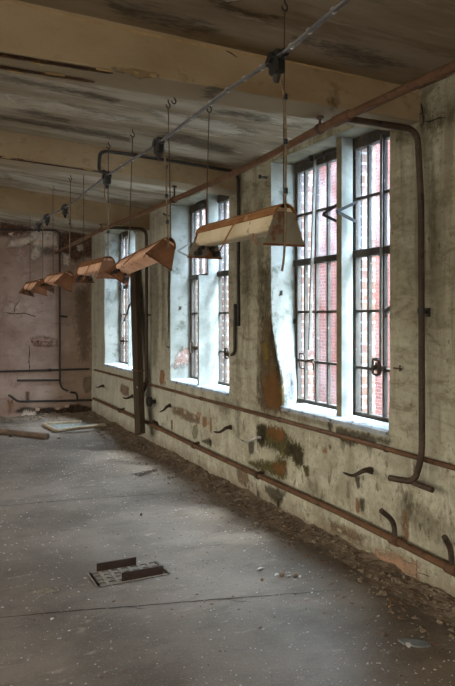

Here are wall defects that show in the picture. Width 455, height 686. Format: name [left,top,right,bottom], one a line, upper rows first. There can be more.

spalling [0,52,158,83]
damp [151,109,246,136]
flaking render [0,222,92,266]
flaking render [174,346,190,368]
corrosion [257,316,286,414]
damp [248,424,309,507]
flaking render [330,521,419,577]